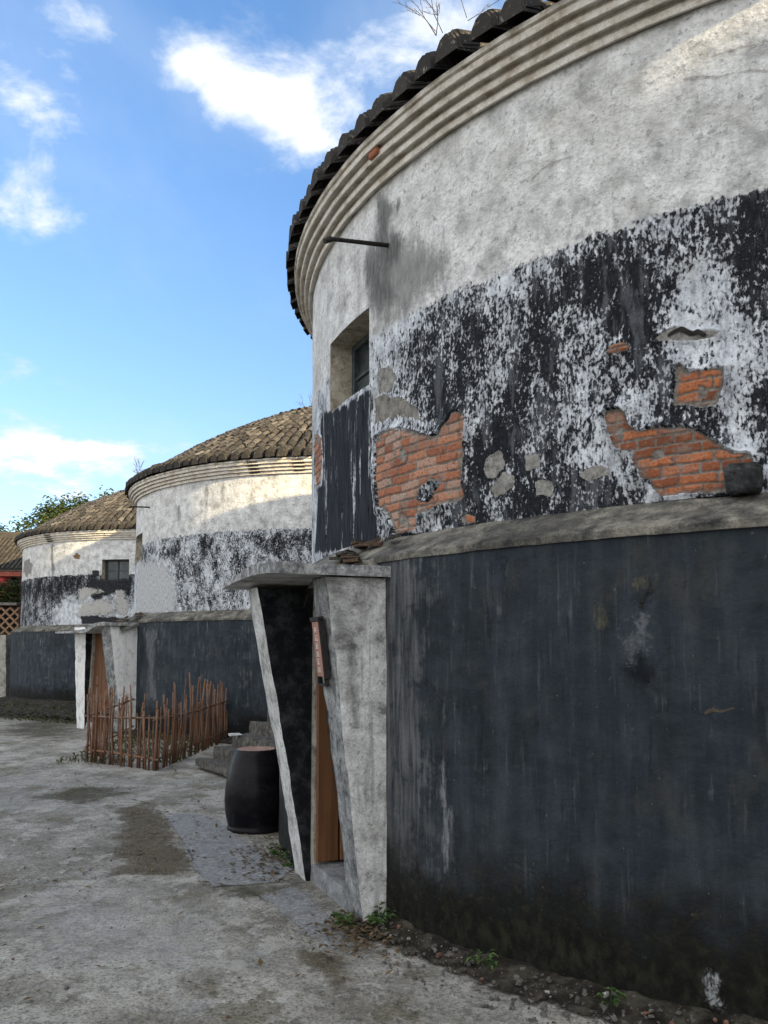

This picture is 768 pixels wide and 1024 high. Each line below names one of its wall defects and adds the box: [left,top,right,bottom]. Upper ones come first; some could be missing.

water stain [364,195,442,321]
flaking render [368,365,515,538]
flaking render [573,318,768,506]
water stain [80,615,123,624]
spalling [76,587,130,619]
water stain [89,570,132,600]
water stain [386,884,768,1022]